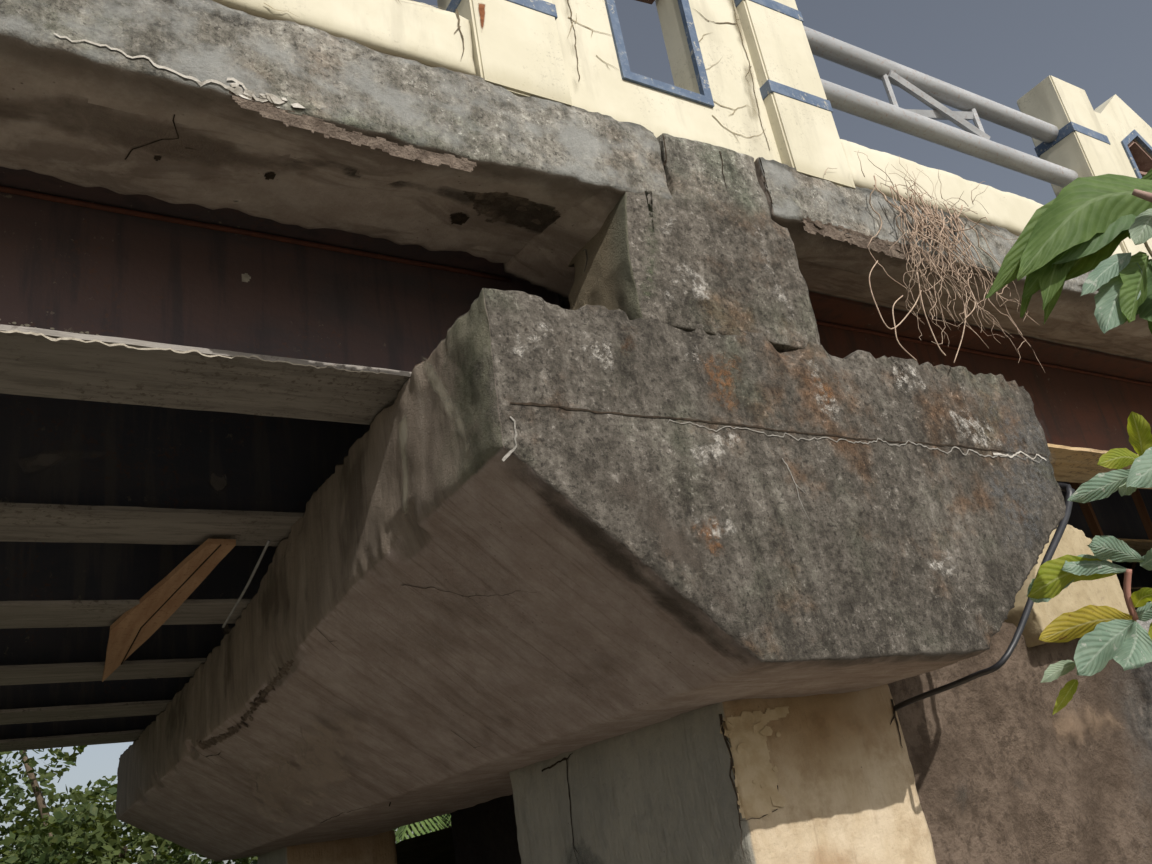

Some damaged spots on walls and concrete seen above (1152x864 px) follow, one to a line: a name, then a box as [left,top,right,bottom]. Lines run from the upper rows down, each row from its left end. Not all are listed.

leakage [54,33,269,102]
crack [125,114,199,160]
spalling [229,83,477,172]
crack [567,0,617,81]
crack [693,4,773,204]
spalling [450,191,560,232]
leakage [500,205,561,233]
crack [510,402,1047,518]
crack [542,753,579,864]
crack [719,714,778,853]
peeling [720,706,789,820]